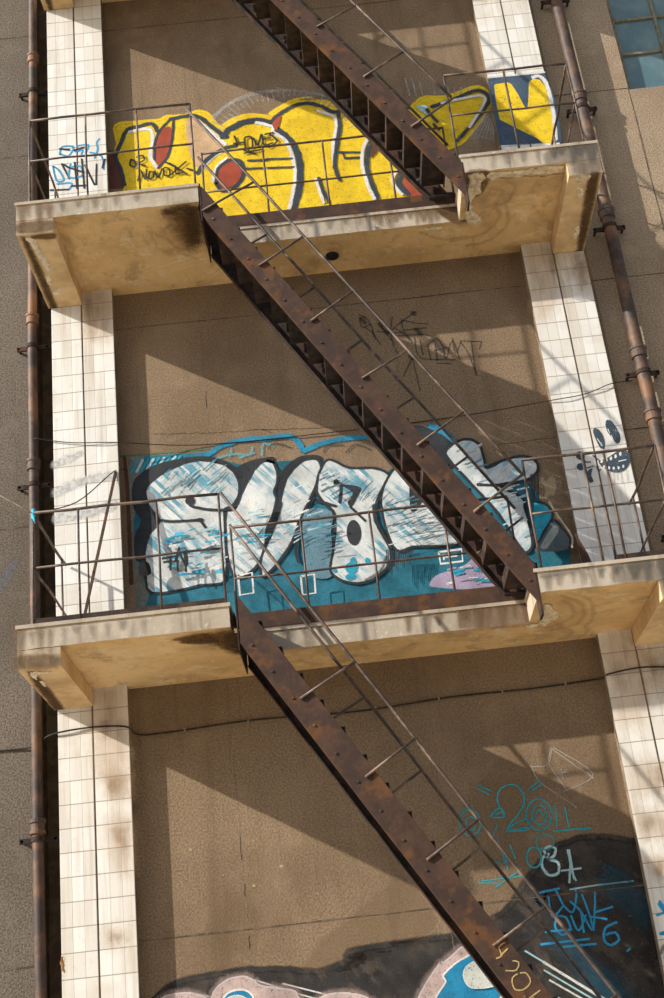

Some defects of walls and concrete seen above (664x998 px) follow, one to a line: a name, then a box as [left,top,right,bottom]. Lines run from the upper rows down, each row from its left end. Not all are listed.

peeling [465,165,599,251]